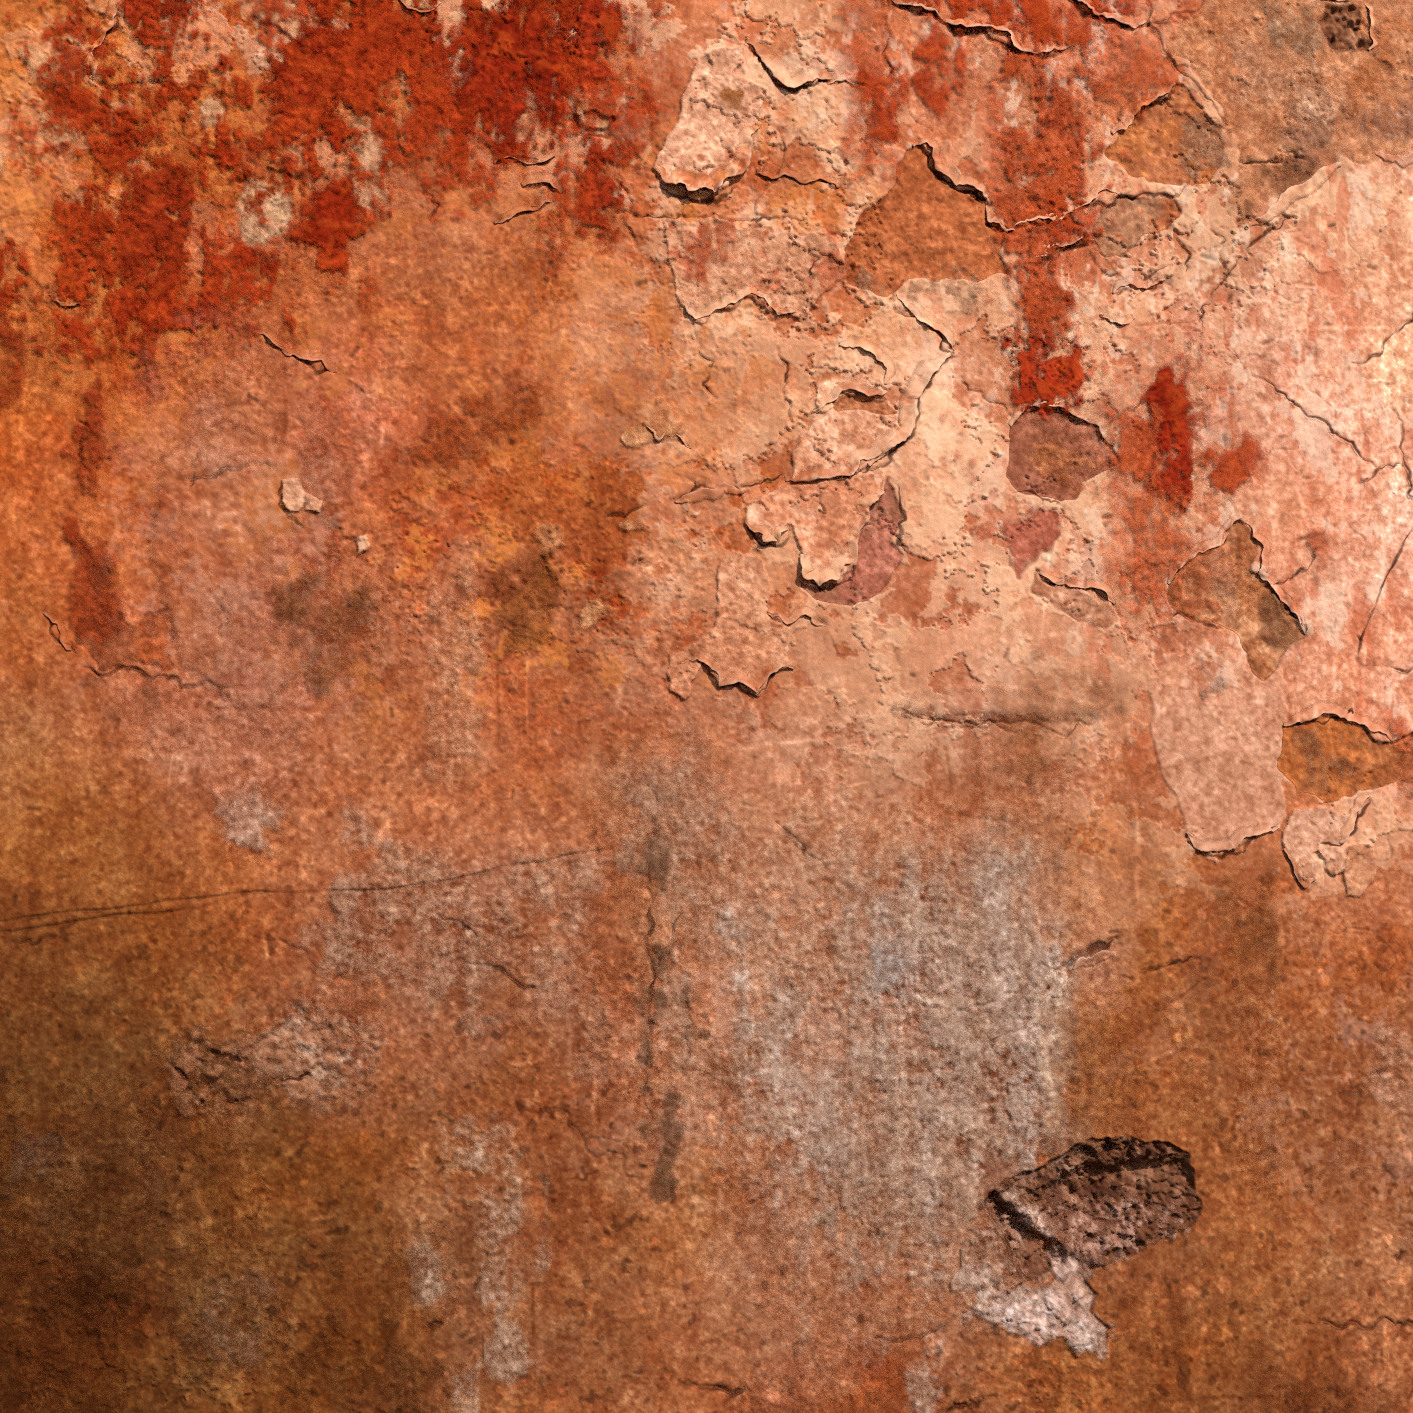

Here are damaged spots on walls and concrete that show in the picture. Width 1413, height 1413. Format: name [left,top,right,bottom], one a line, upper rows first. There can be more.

rust [858,0,1174,420]
rust [0,0,660,643]
peeling [622,0,1413,699]
rust [1107,339,1266,613]
crack [1267,381,1413,498]
crack [1360,320,1413,364]
crack [1359,534,1409,651]
peeling [1186,701,1413,896]
leakage [746,988,855,1174]
leakage [835,845,1077,1234]
spalling [951,1136,1203,1355]
leakage [912,1370,935,1413]